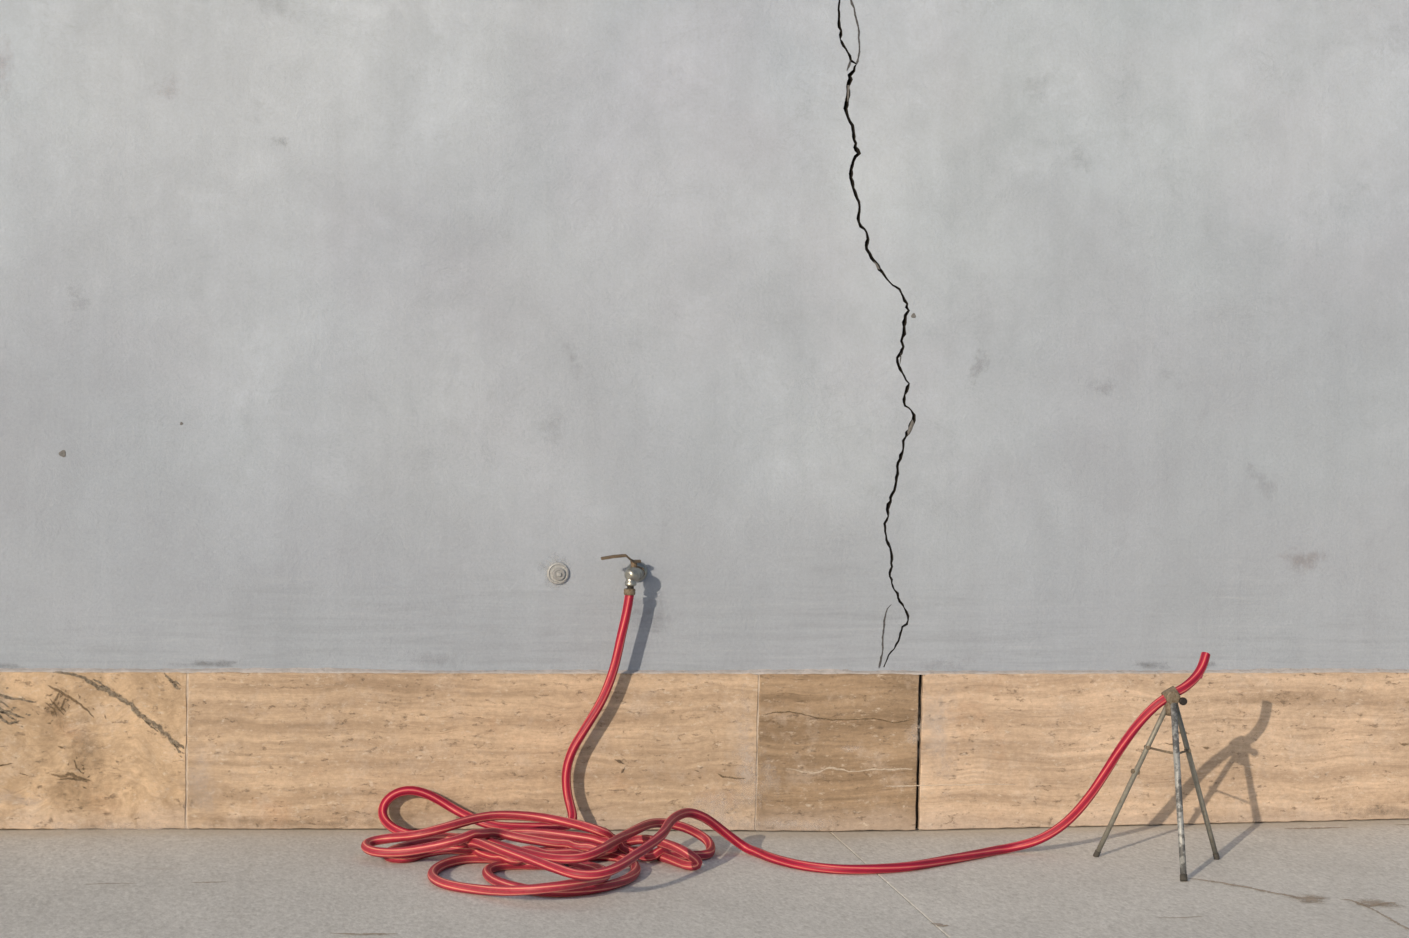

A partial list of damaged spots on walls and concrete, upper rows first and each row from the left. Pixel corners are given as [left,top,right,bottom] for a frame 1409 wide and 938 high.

crack [837,0,916,668]